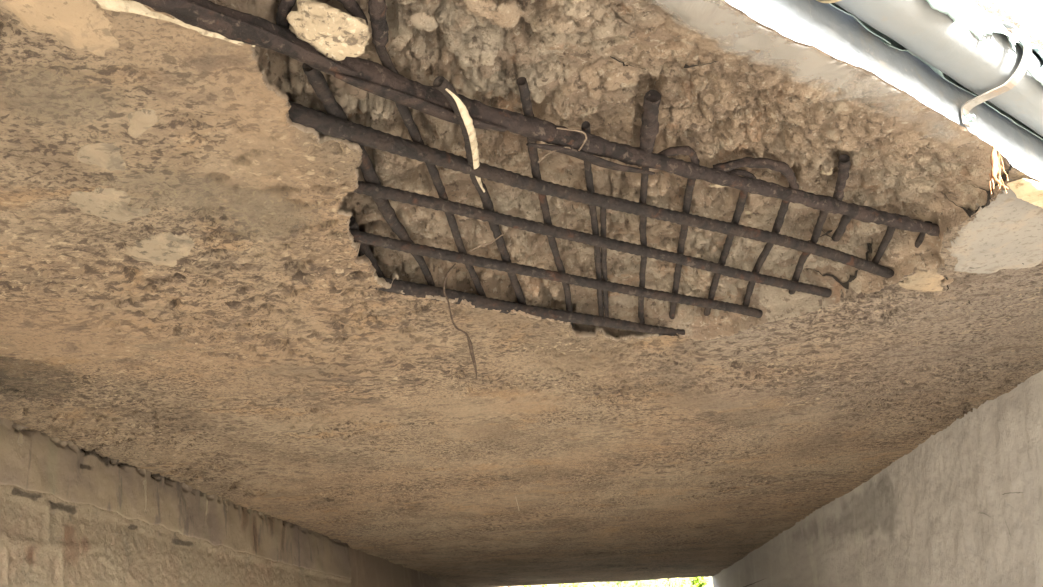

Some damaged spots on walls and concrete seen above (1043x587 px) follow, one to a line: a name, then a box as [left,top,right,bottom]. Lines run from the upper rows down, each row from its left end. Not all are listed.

spalling [96,0,1043,341]